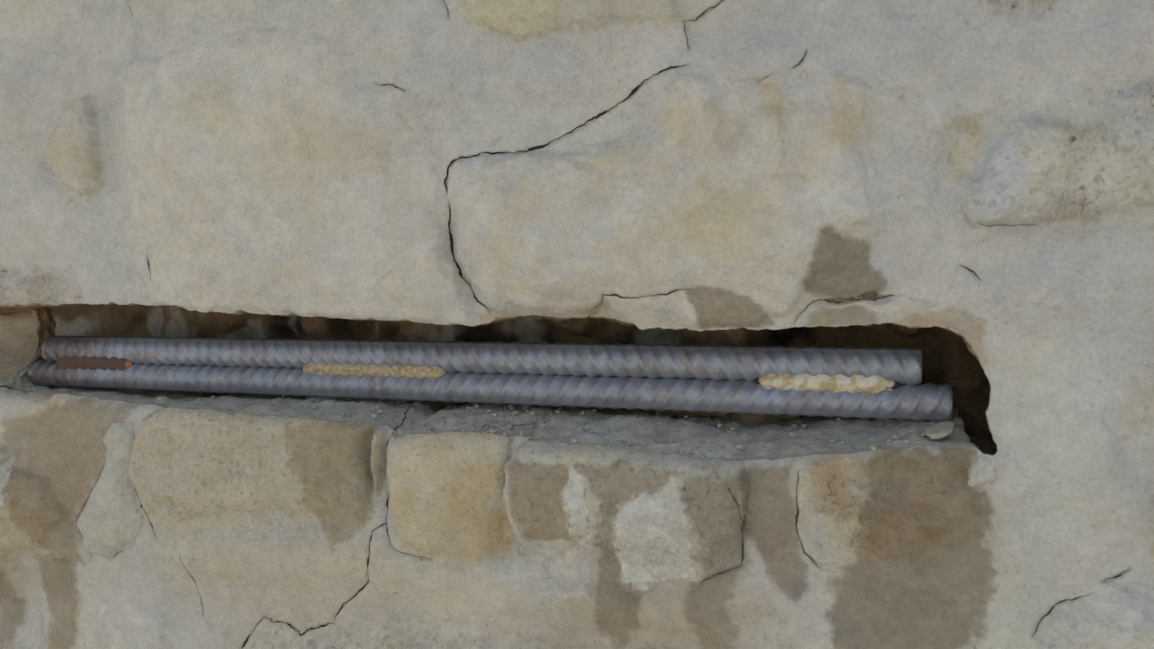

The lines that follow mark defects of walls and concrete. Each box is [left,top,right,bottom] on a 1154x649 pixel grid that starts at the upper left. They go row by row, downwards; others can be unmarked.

crack [444,0,723,313]
spalling [925,421,954,440]
crack [242,493,432,648]